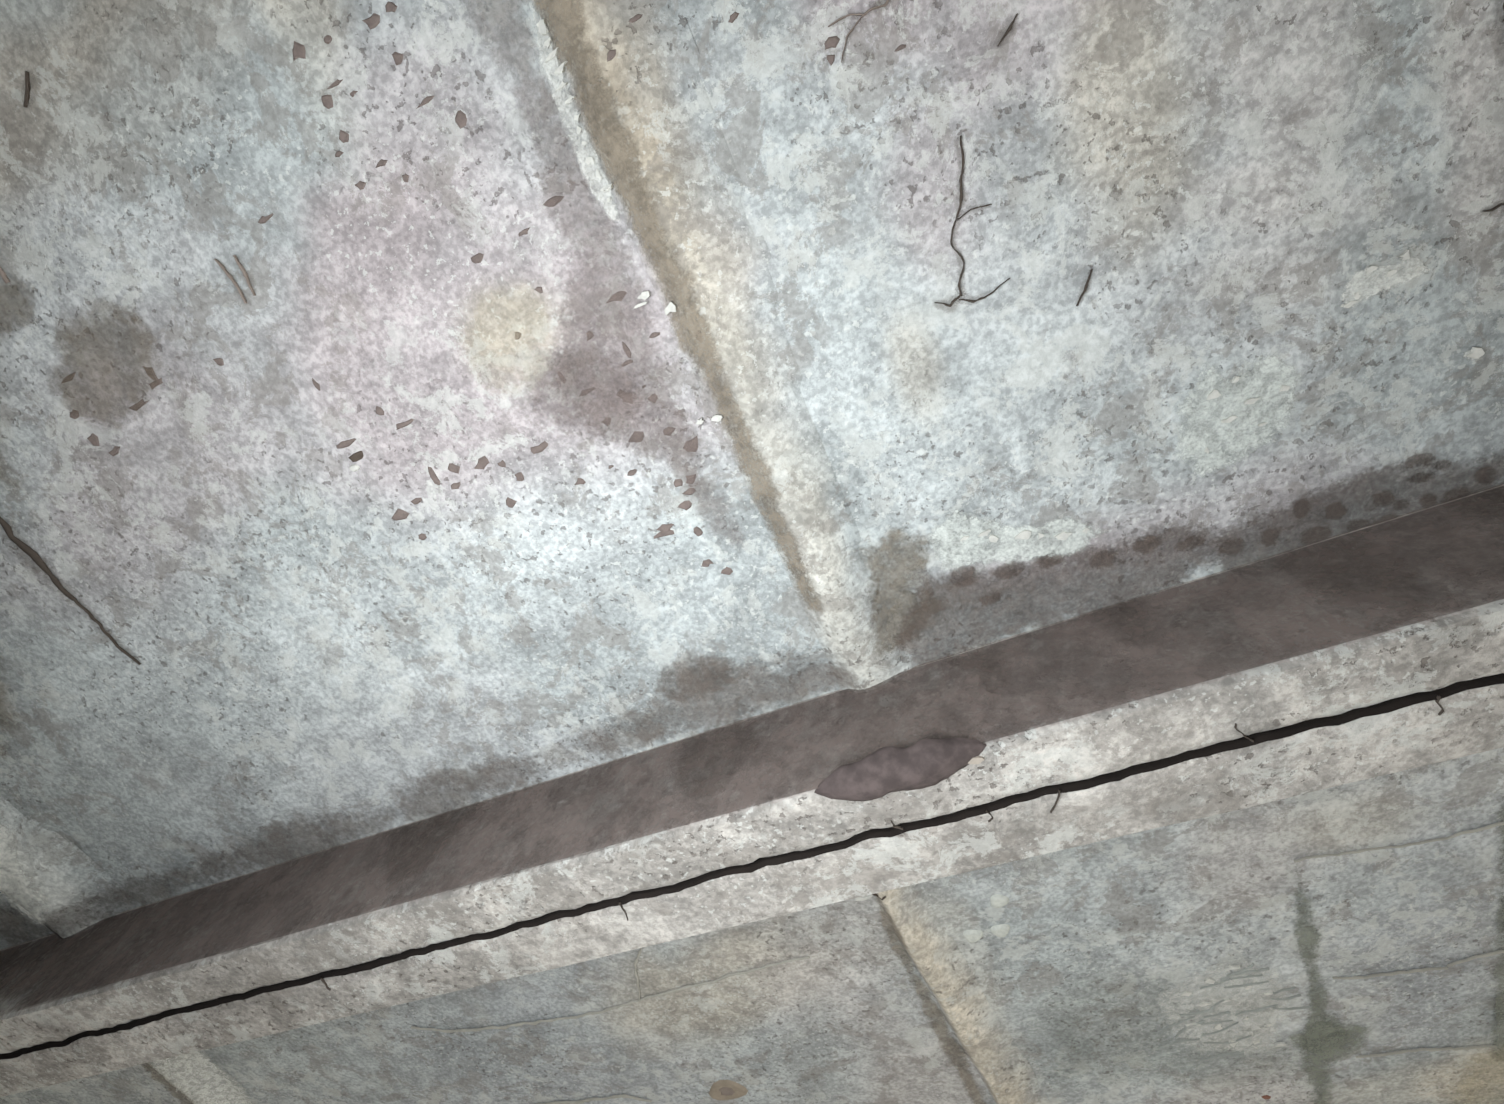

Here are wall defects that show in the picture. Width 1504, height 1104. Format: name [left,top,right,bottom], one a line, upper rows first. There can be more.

crack [828,0,889,63]
crack [935,135,1010,307]
crack [1481,203,1504,212]
crack [0,517,142,665]
damp [0,454,1504,1007]
crack [0,673,1504,1060]